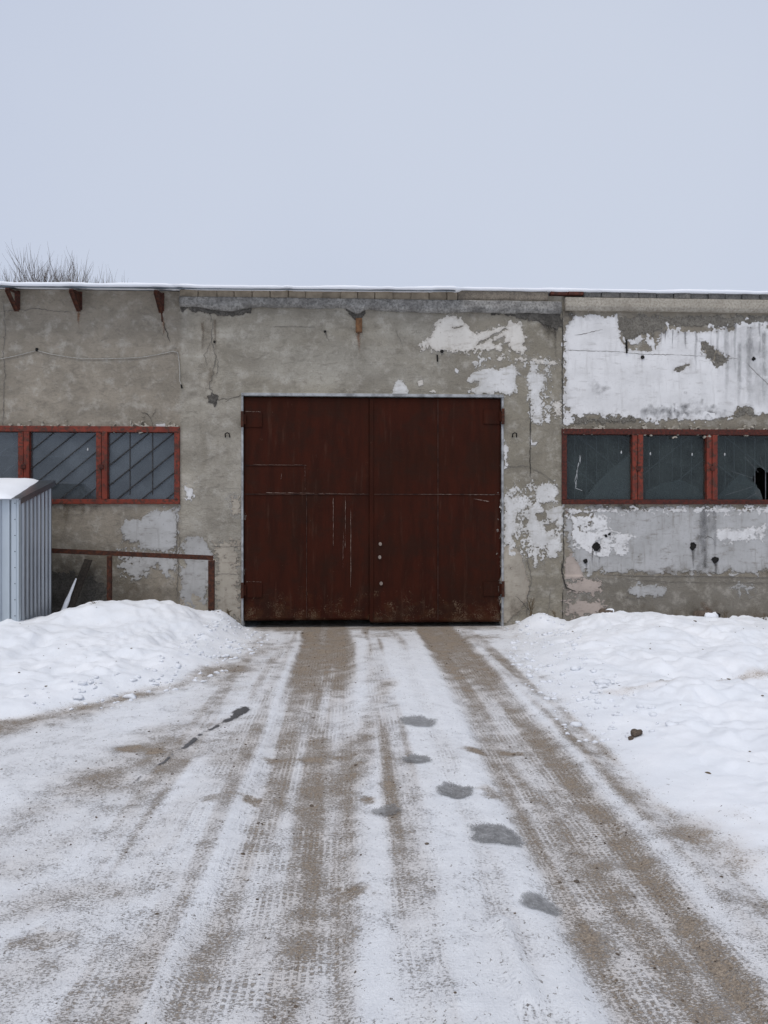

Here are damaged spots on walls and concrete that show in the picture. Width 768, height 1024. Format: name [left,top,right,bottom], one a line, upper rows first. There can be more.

peeling [419,311,768,439]
peeling [116,482,241,621]
peeling [496,479,768,623]